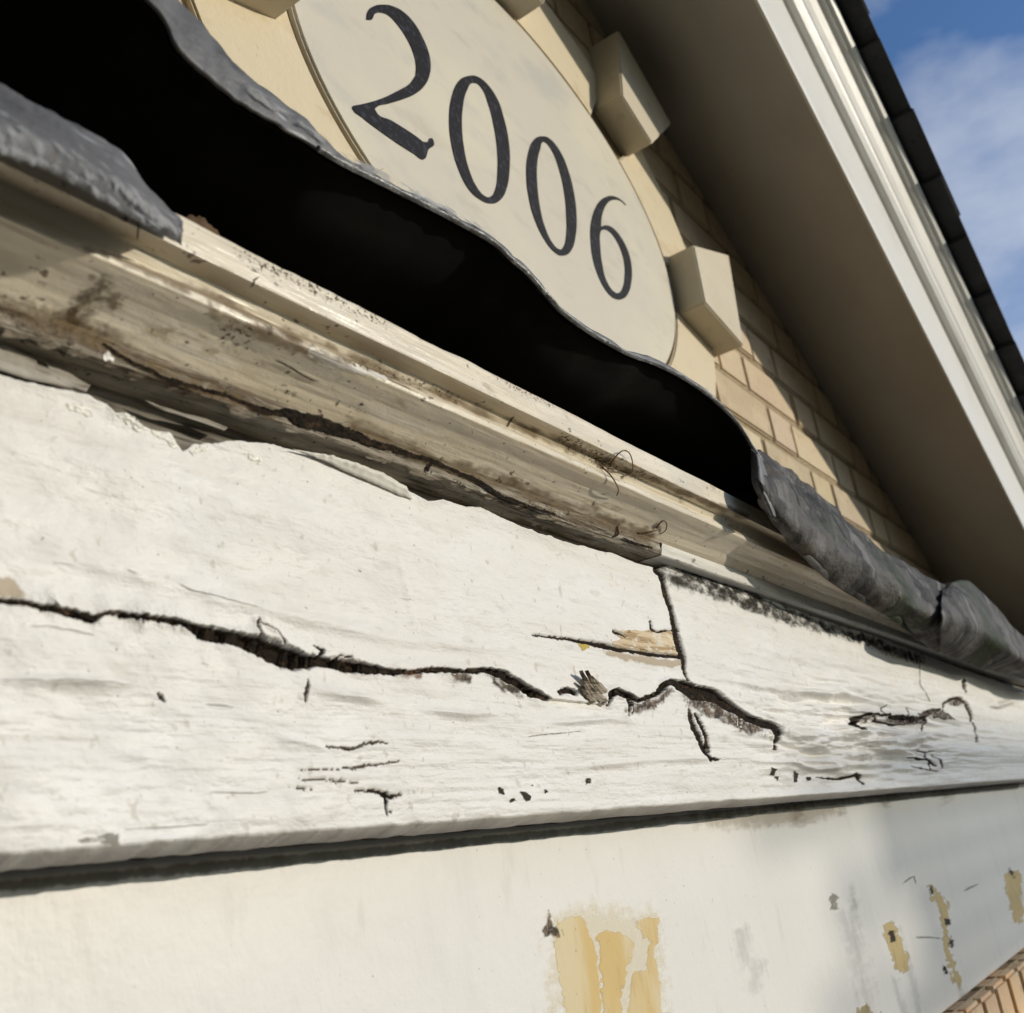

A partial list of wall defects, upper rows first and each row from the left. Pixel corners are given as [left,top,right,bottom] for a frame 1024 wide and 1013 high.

water stain [255,325,307,353]
peeling [0,342,92,417]
peeling [144,400,228,431]
peeling [294,449,413,499]
water stain [455,463,569,513]
water stain [574,515,624,533]
crack [0,599,570,699]
peeling [607,630,681,668]
crack [537,526,779,761]
water stain [661,560,926,664]
crack [849,661,976,772]
crack [296,741,396,814]